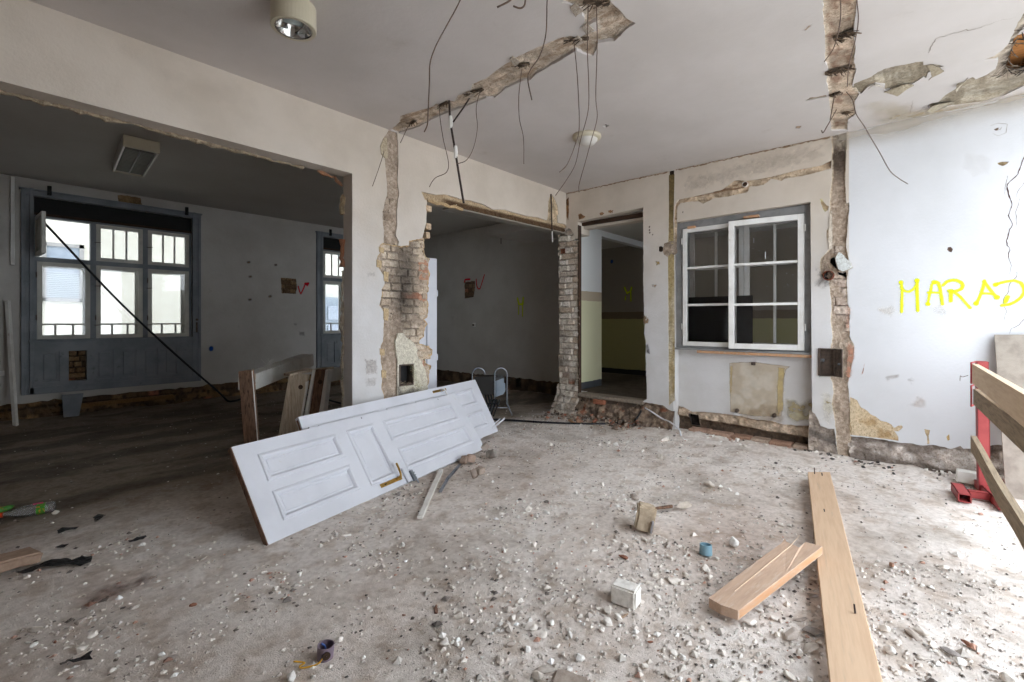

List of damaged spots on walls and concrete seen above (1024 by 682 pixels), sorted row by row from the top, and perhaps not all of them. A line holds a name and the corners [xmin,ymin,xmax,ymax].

flaking render [852,62,944,96]
flaking render [927,14,1024,113]
flaking render [376,192,585,399]
crack [1003,158,1024,334]
flaking render [575,362,976,474]
flaking render [990,445,1004,476]